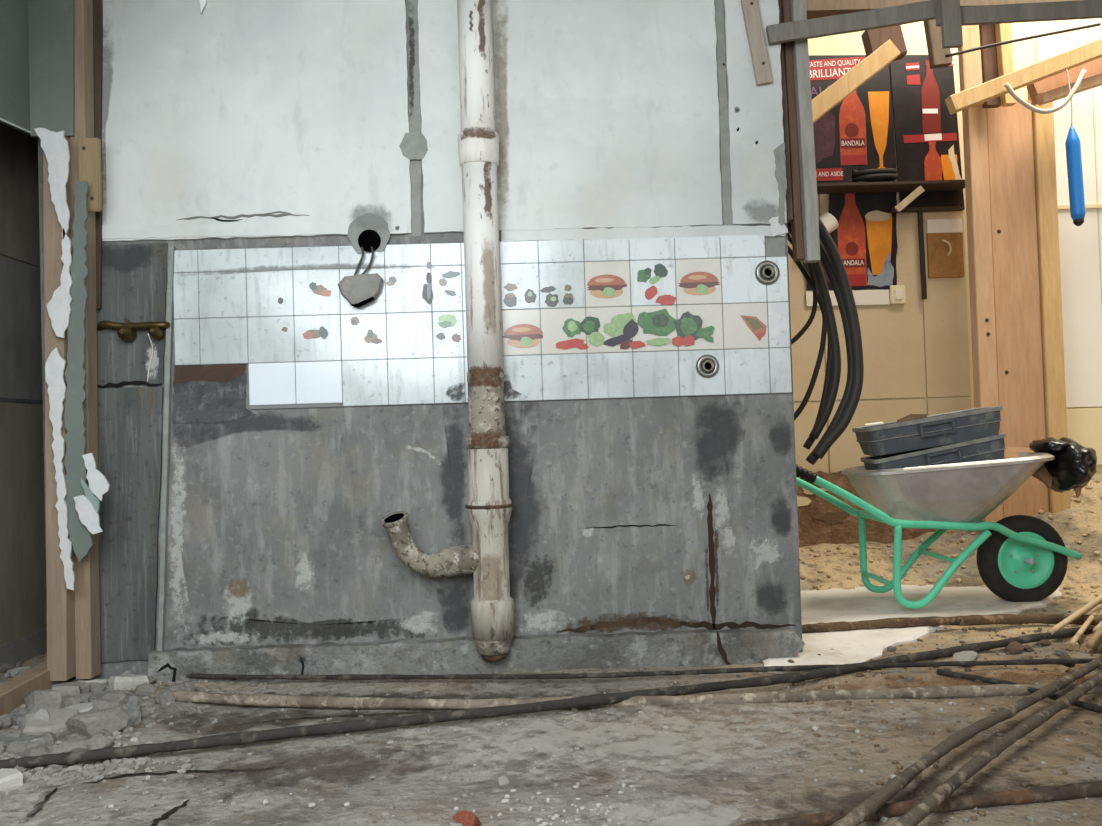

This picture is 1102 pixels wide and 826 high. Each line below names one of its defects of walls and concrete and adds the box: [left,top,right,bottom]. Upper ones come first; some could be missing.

rust [469,0,486,56]
crack [176,211,310,222]
peeling [35,128,110,590]
rust [468,366,503,387]
rust [469,431,501,448]
water stain [692,405,742,554]
crack [583,524,676,537]
water stain [749,501,790,570]
crack [705,494,731,665]
water stain [758,586,786,612]
crack [17,766,280,826]